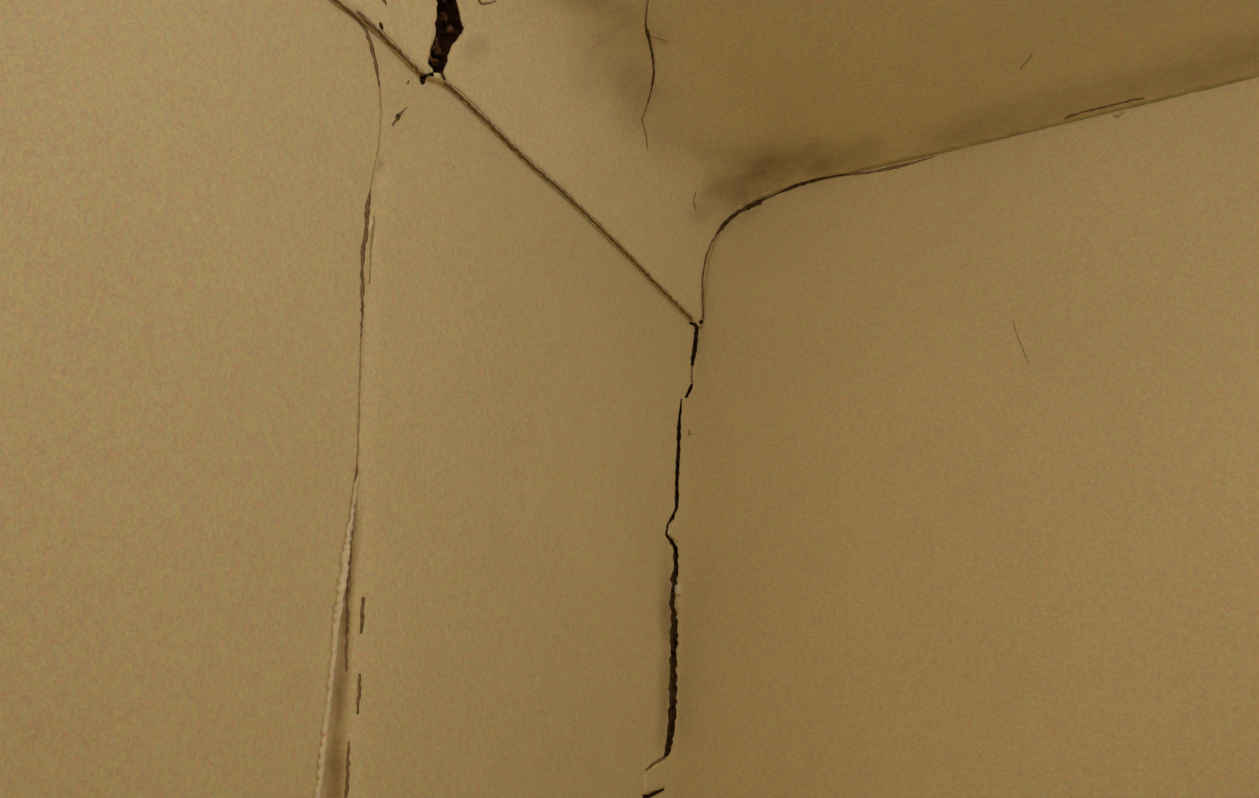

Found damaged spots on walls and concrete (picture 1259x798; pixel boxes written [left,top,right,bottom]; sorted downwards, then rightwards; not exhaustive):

crack [333,0,1259,798]